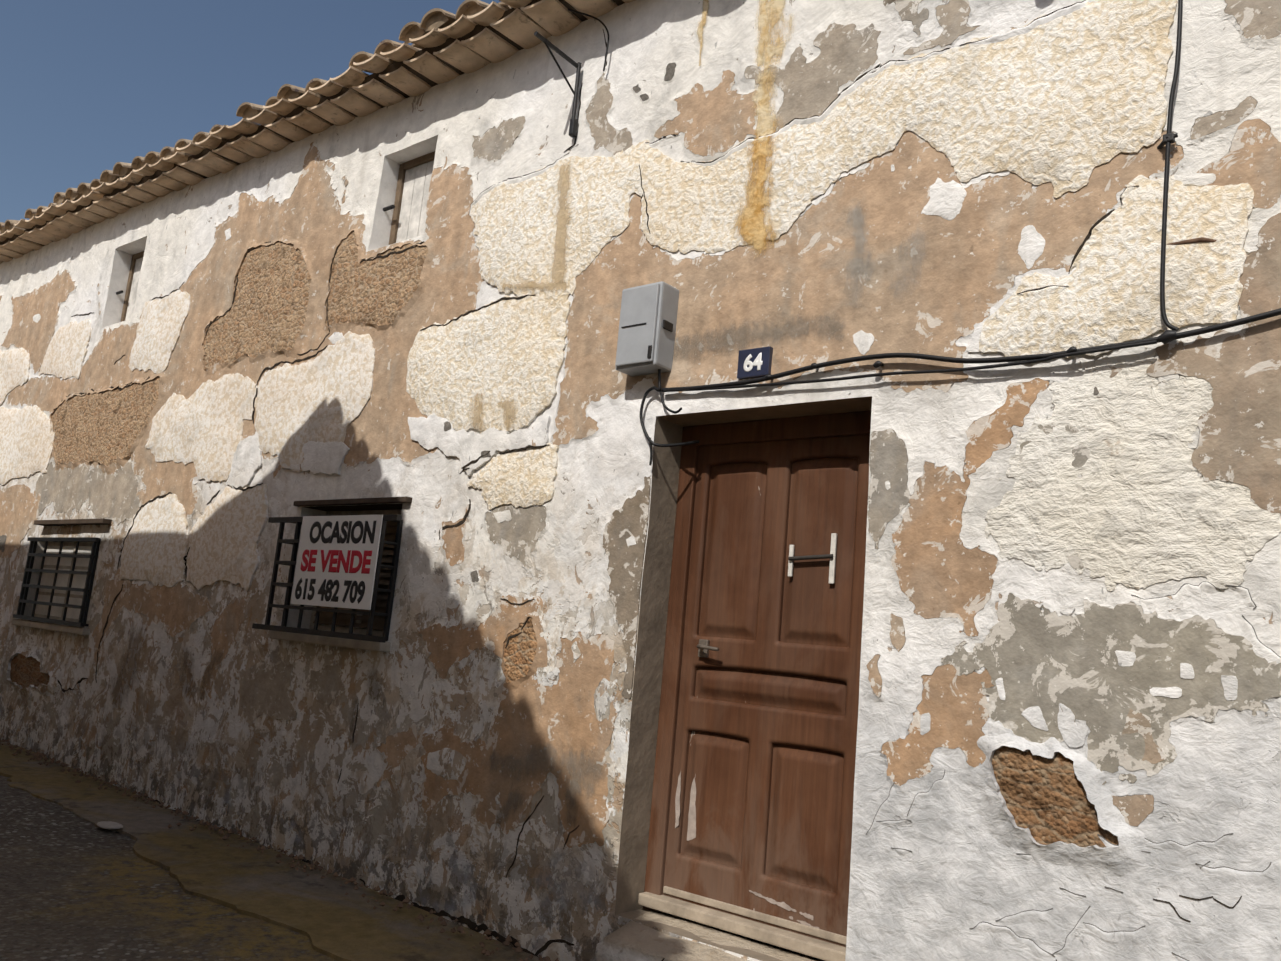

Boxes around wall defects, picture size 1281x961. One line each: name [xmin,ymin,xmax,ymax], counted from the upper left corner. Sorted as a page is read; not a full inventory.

rust [735,0,792,254]
flaking render [0,107,536,562]
flaking render [551,85,1281,517]
flaking render [6,643,61,704]
flaking render [92,566,216,661]
flaking render [236,649,302,736]
flaking render [410,466,651,864]
flaking render [860,367,1281,880]
peeling [675,772,696,841]
crack [866,770,948,856]
peeling [749,890,819,929]
crack [969,833,1276,961]